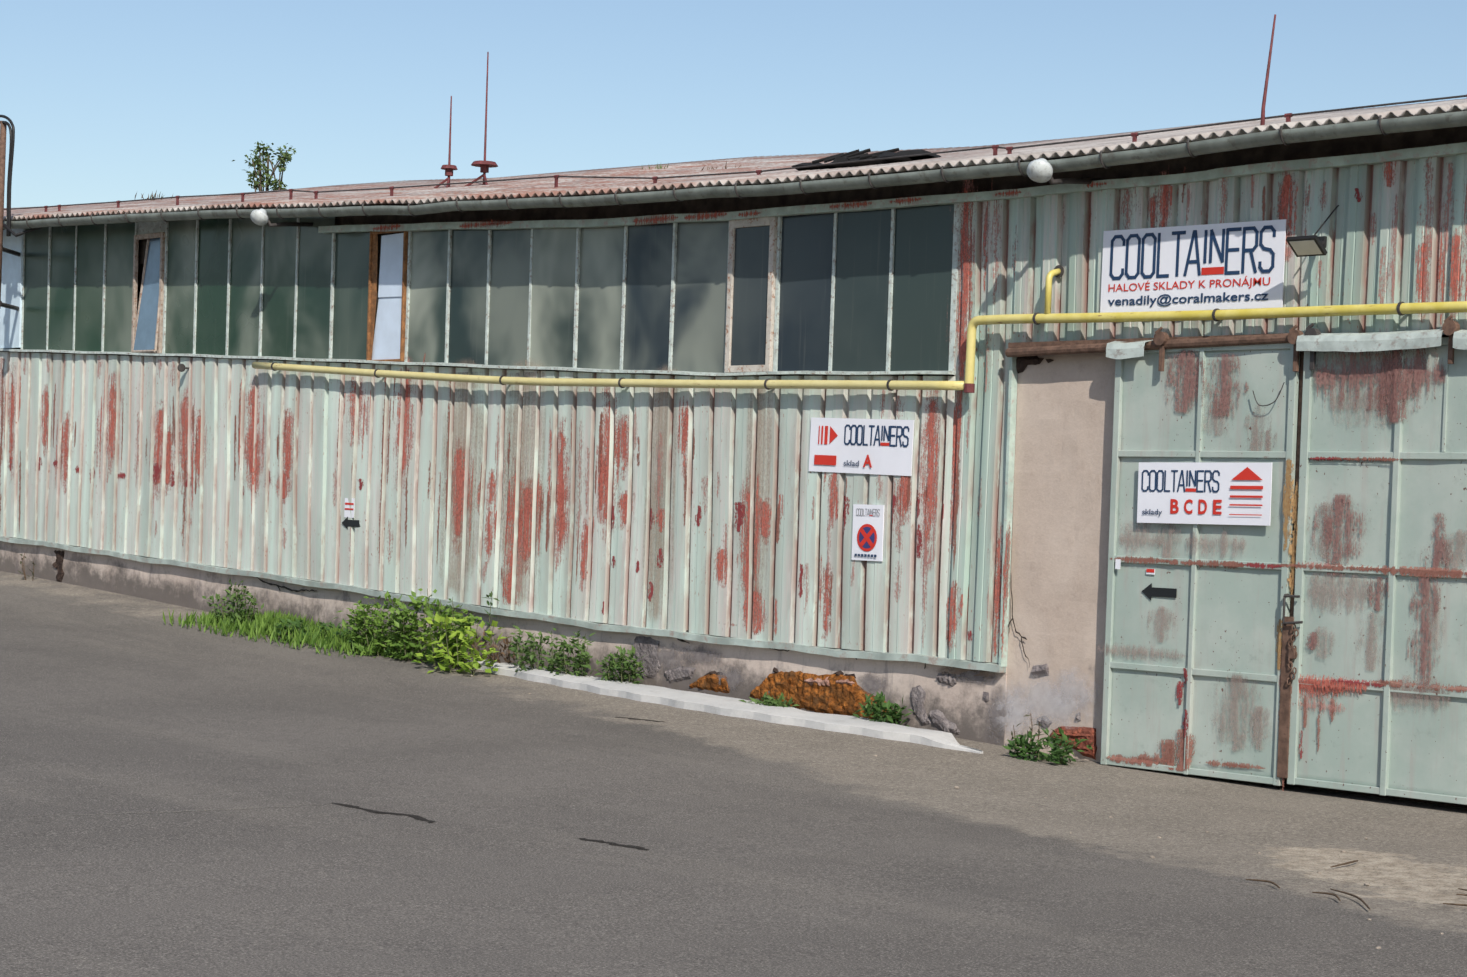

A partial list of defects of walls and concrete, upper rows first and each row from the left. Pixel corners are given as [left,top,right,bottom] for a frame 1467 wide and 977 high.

corrosion [1165,350,1270,451]
corrosion [427,381,482,558]
corrosion [501,433,557,605]
corrosion [636,434,671,601]
corrosion [731,475,784,635]
corrosion [1110,456,1467,720]
flaking render [633,636,730,693]
flaking render [749,667,960,735]
flaking render [1031,664,1049,678]
flaking render [1037,713,1097,760]
corrosion [1106,729,1265,771]